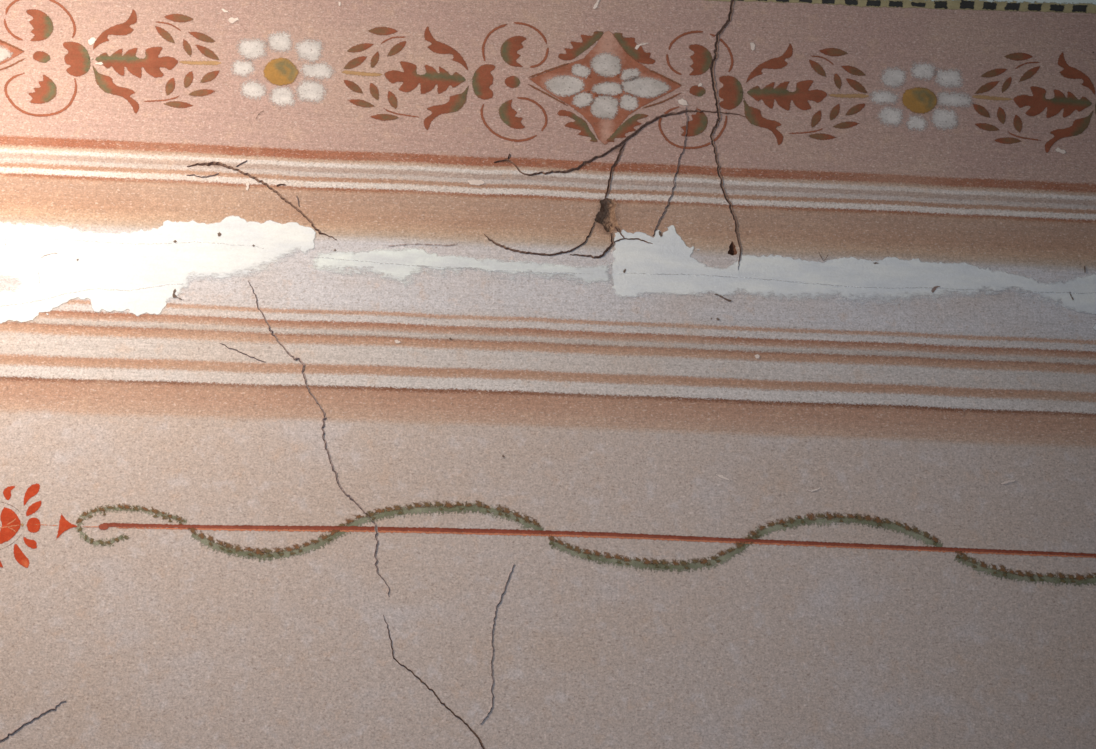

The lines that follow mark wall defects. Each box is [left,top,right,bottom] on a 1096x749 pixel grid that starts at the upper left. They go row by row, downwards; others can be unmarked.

crack [186,160,342,260]
crack [370,243,455,269]
crack [484,0,880,288]
crack [220,281,514,749]